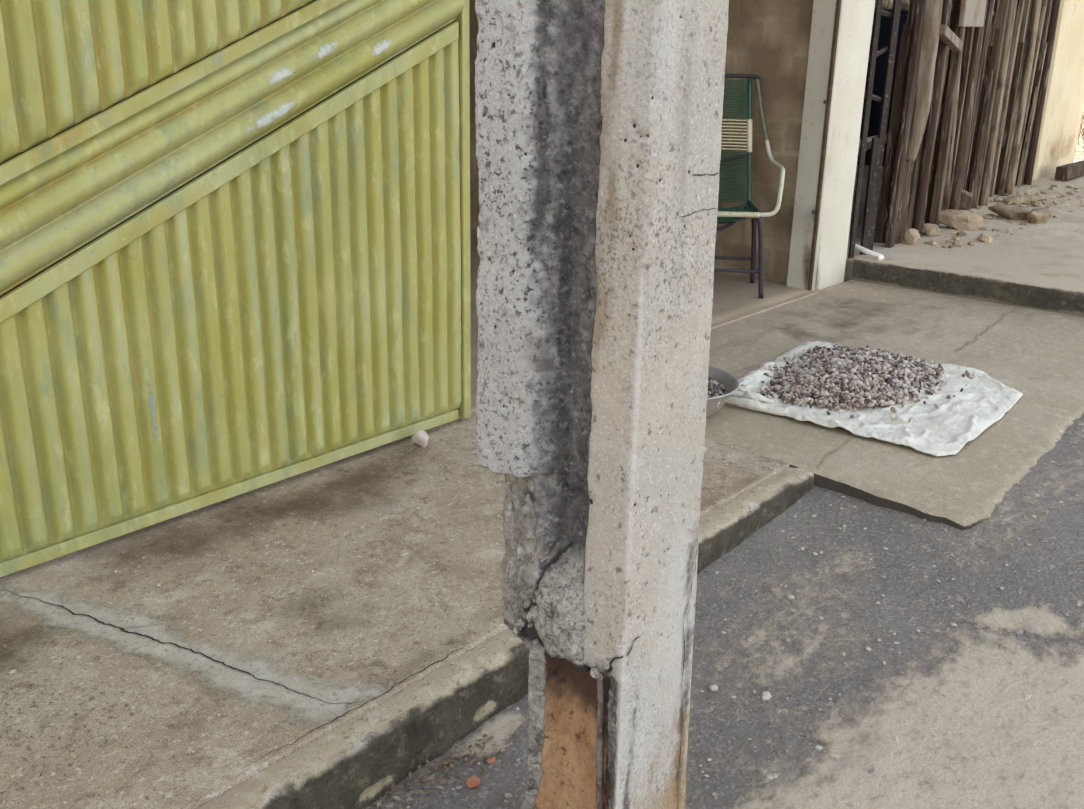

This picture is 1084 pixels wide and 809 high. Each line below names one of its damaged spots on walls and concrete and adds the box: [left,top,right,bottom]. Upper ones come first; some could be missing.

damp [531,0,605,557]
crack [0,589,464,767]
spalling [474,701,496,721]
spalling [483,467,547,809]
rust [534,652,611,809]
spalling [590,666,618,809]